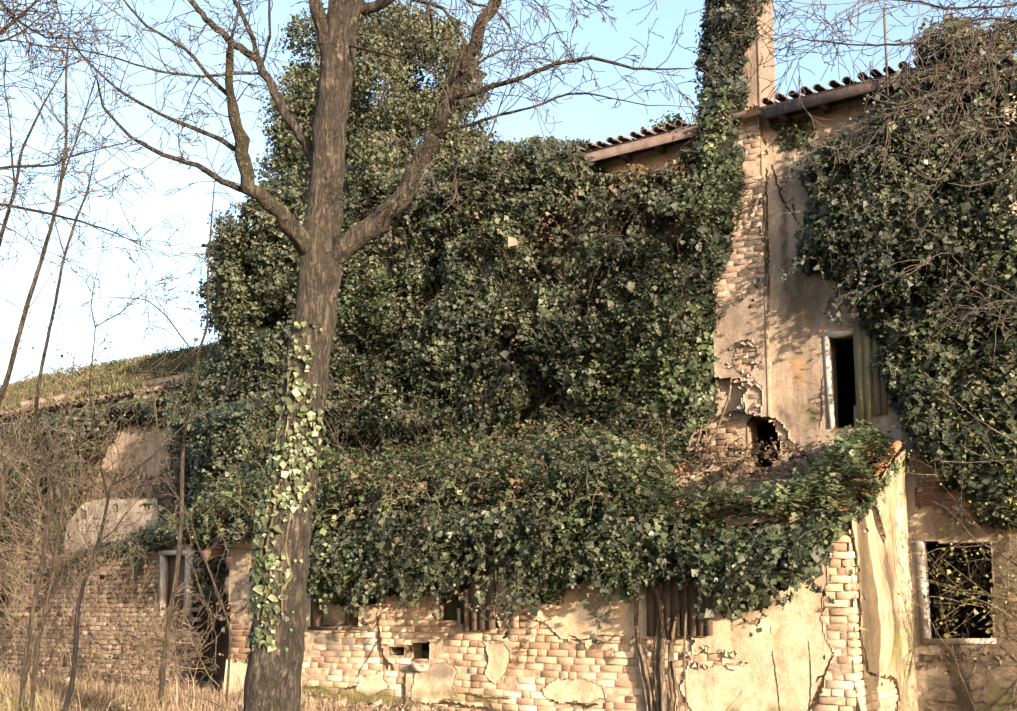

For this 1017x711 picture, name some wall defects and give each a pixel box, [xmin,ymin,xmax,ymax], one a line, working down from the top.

flaking render [713,102,770,307]
flaking render [701,337,772,477]
flaking render [752,431,805,478]
crack [301,618,407,706]
flaking render [301,595,750,711]
flaking render [810,530,900,711]